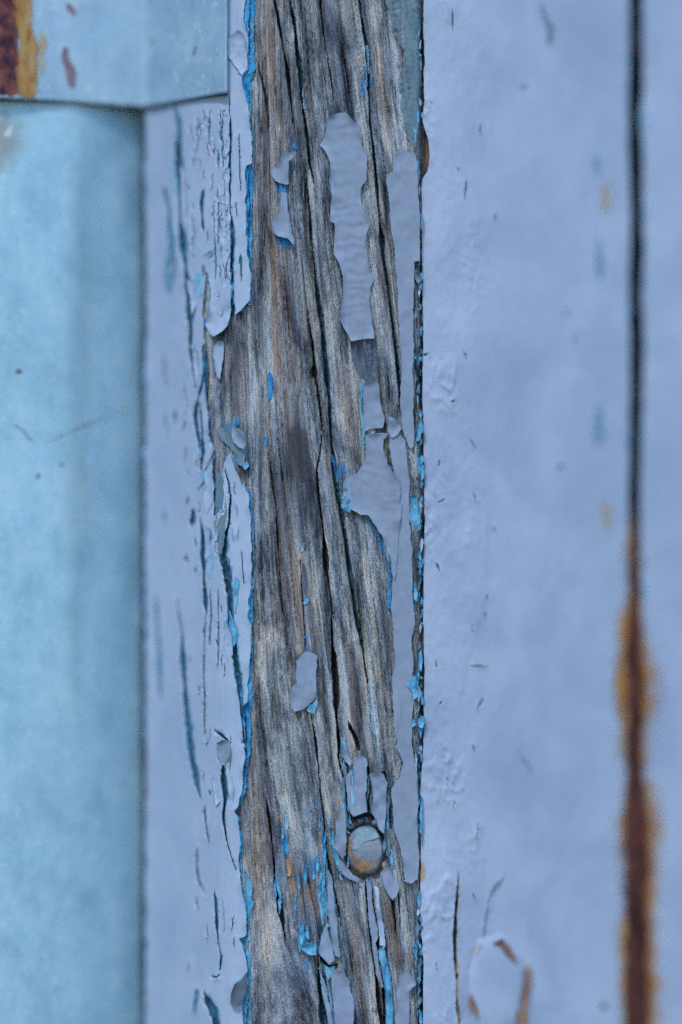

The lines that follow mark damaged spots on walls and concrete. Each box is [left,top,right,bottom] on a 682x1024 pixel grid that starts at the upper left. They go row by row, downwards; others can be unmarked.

rust [0,0,46,98]
peeling [172,108,231,379]
peeling [228,0,256,271]
crack [155,95,245,1024]
peeling [185,451,255,806]
peeling [207,819,254,1024]
crack [258,0,391,945]
peeling [270,0,429,1024]
rust [348,837,373,871]
crack [319,0,426,847]
crack [365,882,423,1024]
rust [616,522,662,1024]